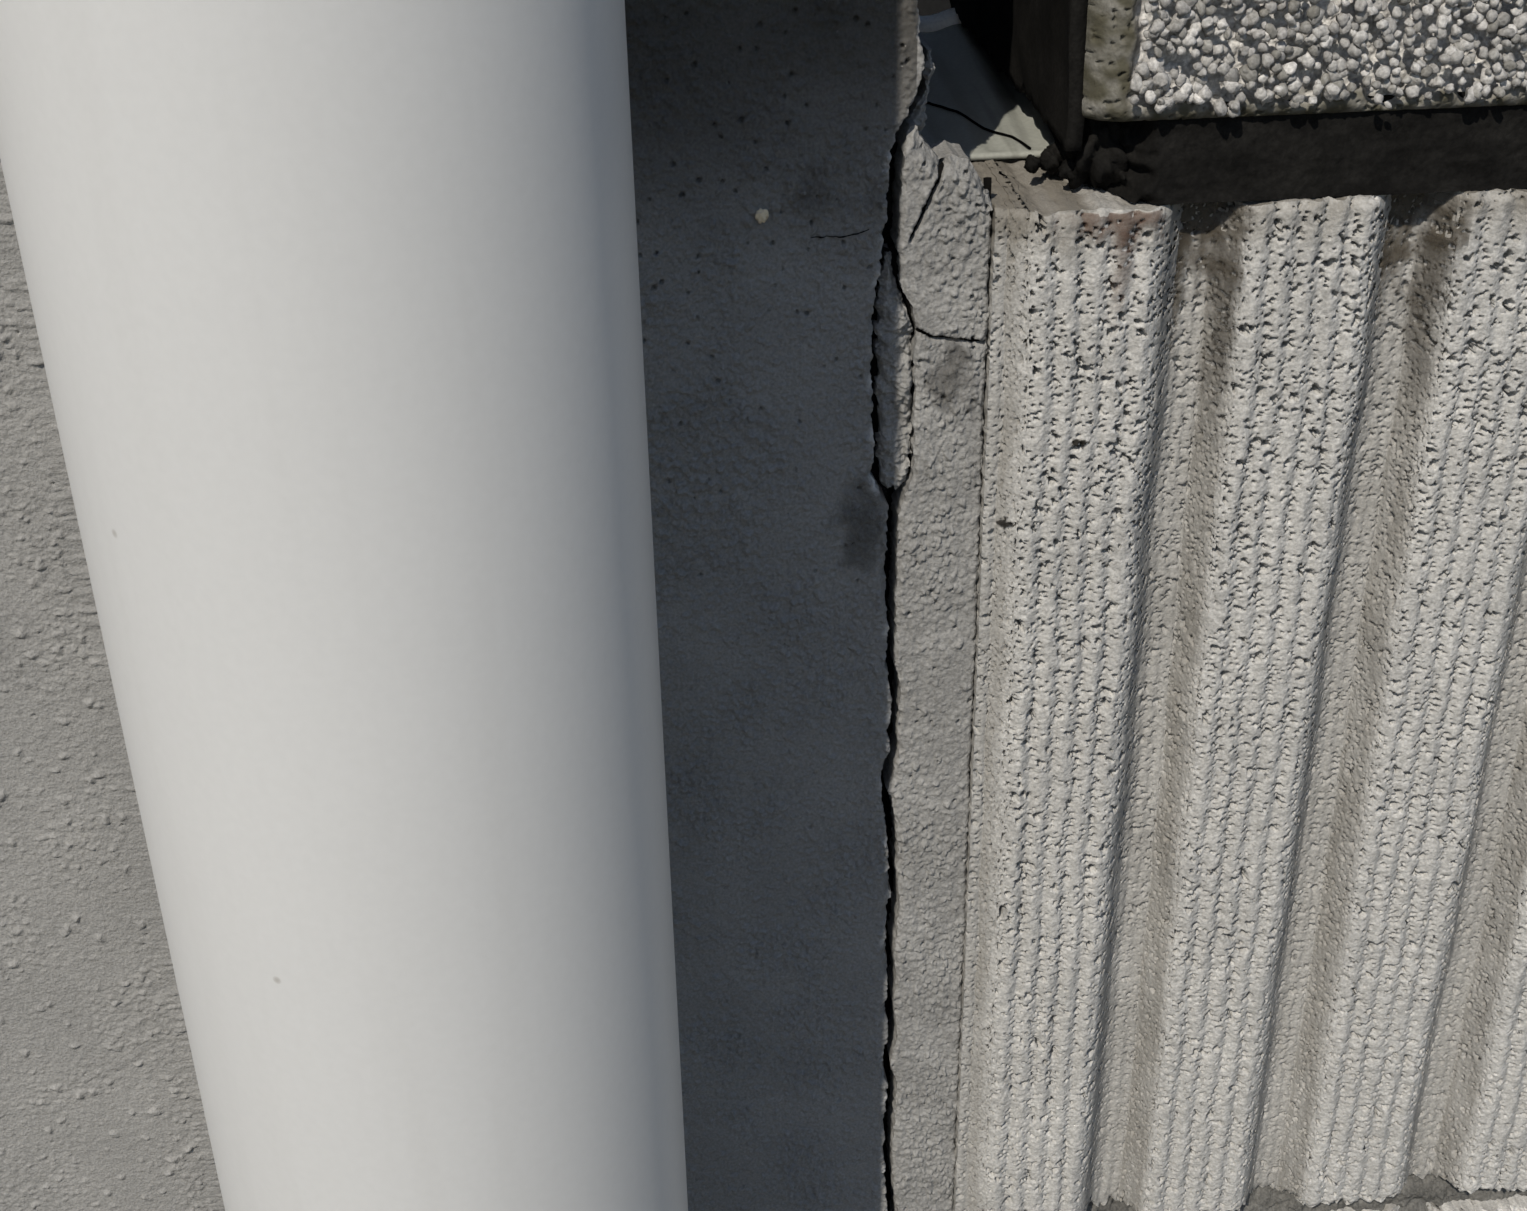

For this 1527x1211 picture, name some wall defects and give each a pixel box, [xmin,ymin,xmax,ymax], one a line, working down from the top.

crack [811,131,980,1211]
crack [983,177,992,200]